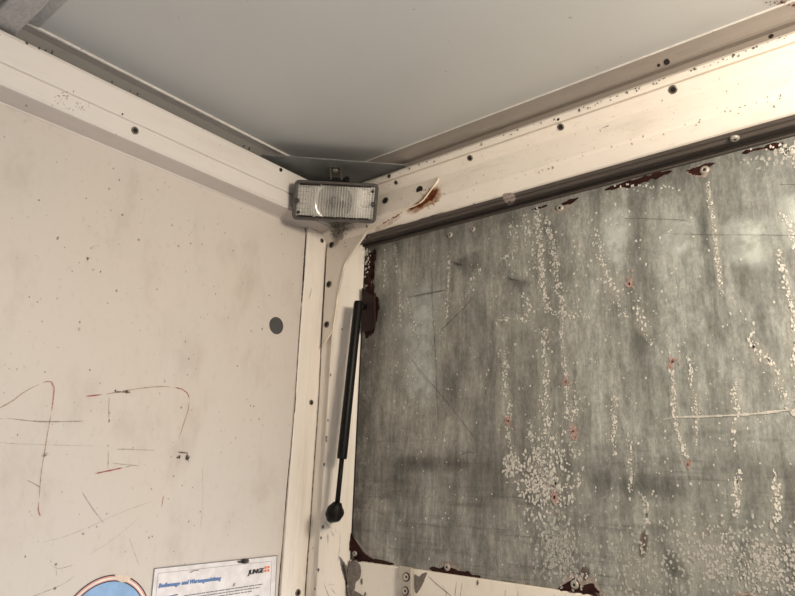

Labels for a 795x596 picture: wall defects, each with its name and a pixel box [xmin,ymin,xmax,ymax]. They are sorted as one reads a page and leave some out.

corrosion [409,188,445,212]
damp [740,222,759,261]
peeling [339,557,366,596]